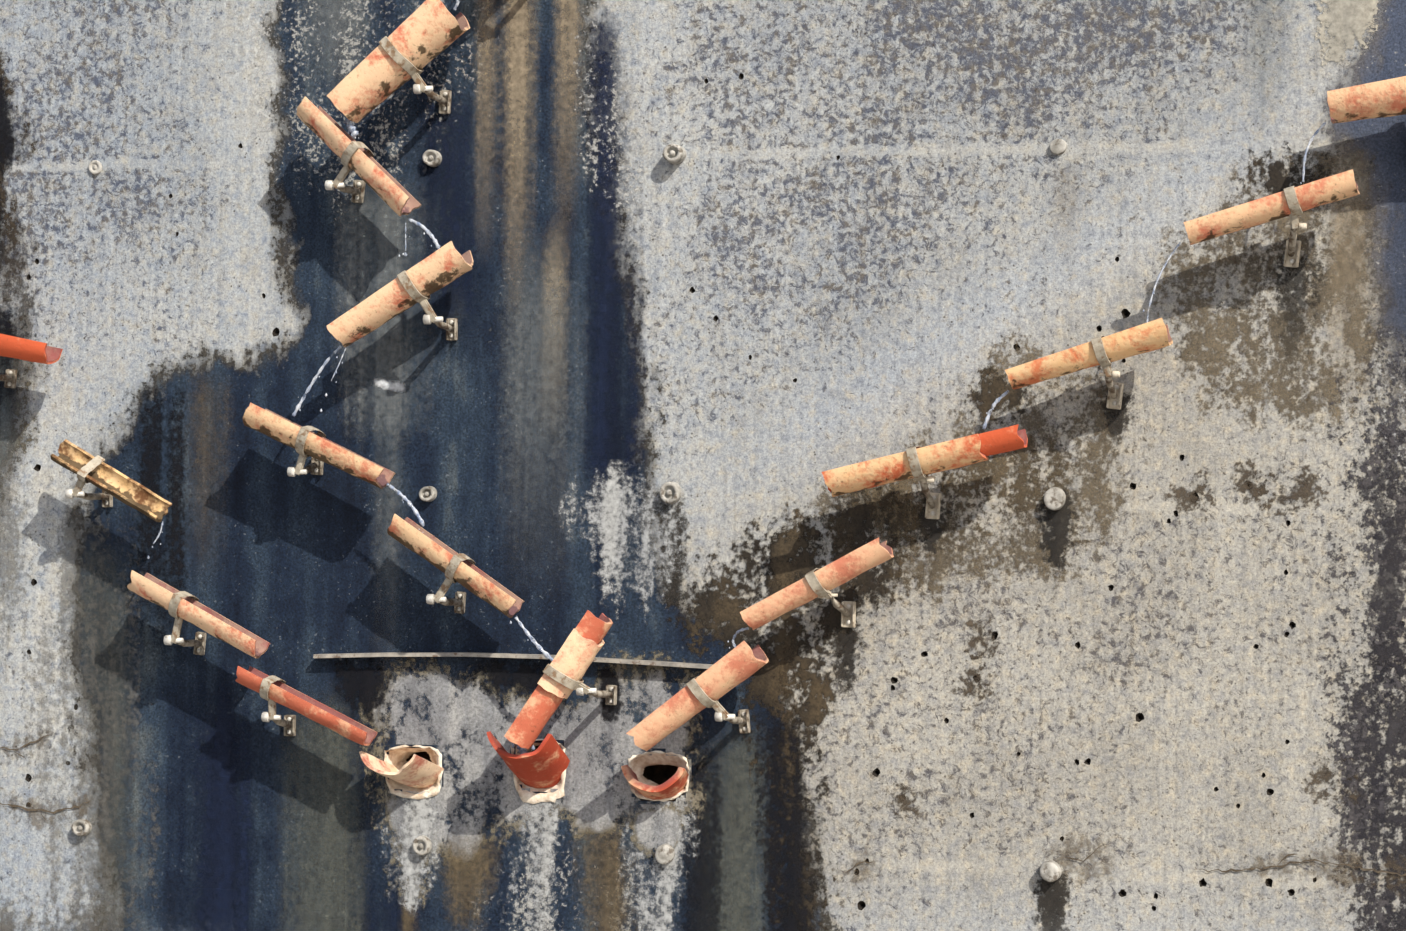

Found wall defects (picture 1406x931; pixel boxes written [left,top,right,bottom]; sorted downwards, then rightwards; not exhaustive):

water stain [0,51,38,341]
water stain [0,356,49,507]
water stain [62,0,1135,931]
water stain [1151,0,1406,931]
crack [1194,820,1406,877]